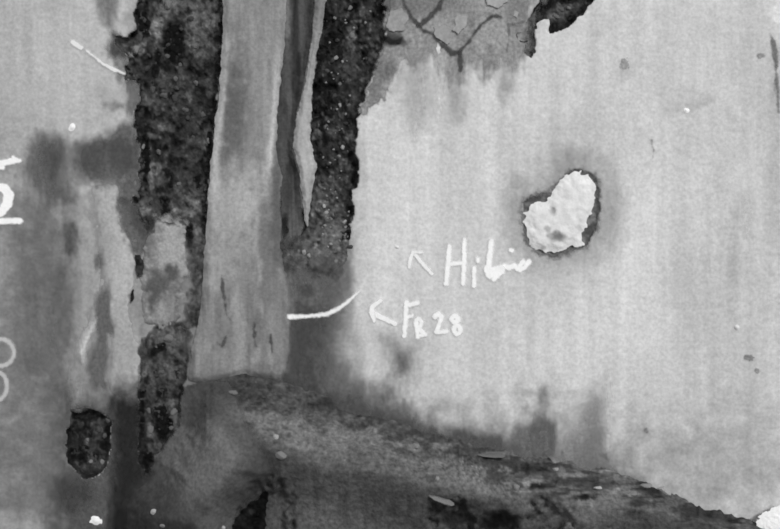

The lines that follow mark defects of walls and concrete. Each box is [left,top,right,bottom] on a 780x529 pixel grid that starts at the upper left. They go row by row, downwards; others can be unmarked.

crack [377,0,524,72]
water stain [27,118,141,203]
spalling [280,0,593,273]
hole [232,491,269,529]